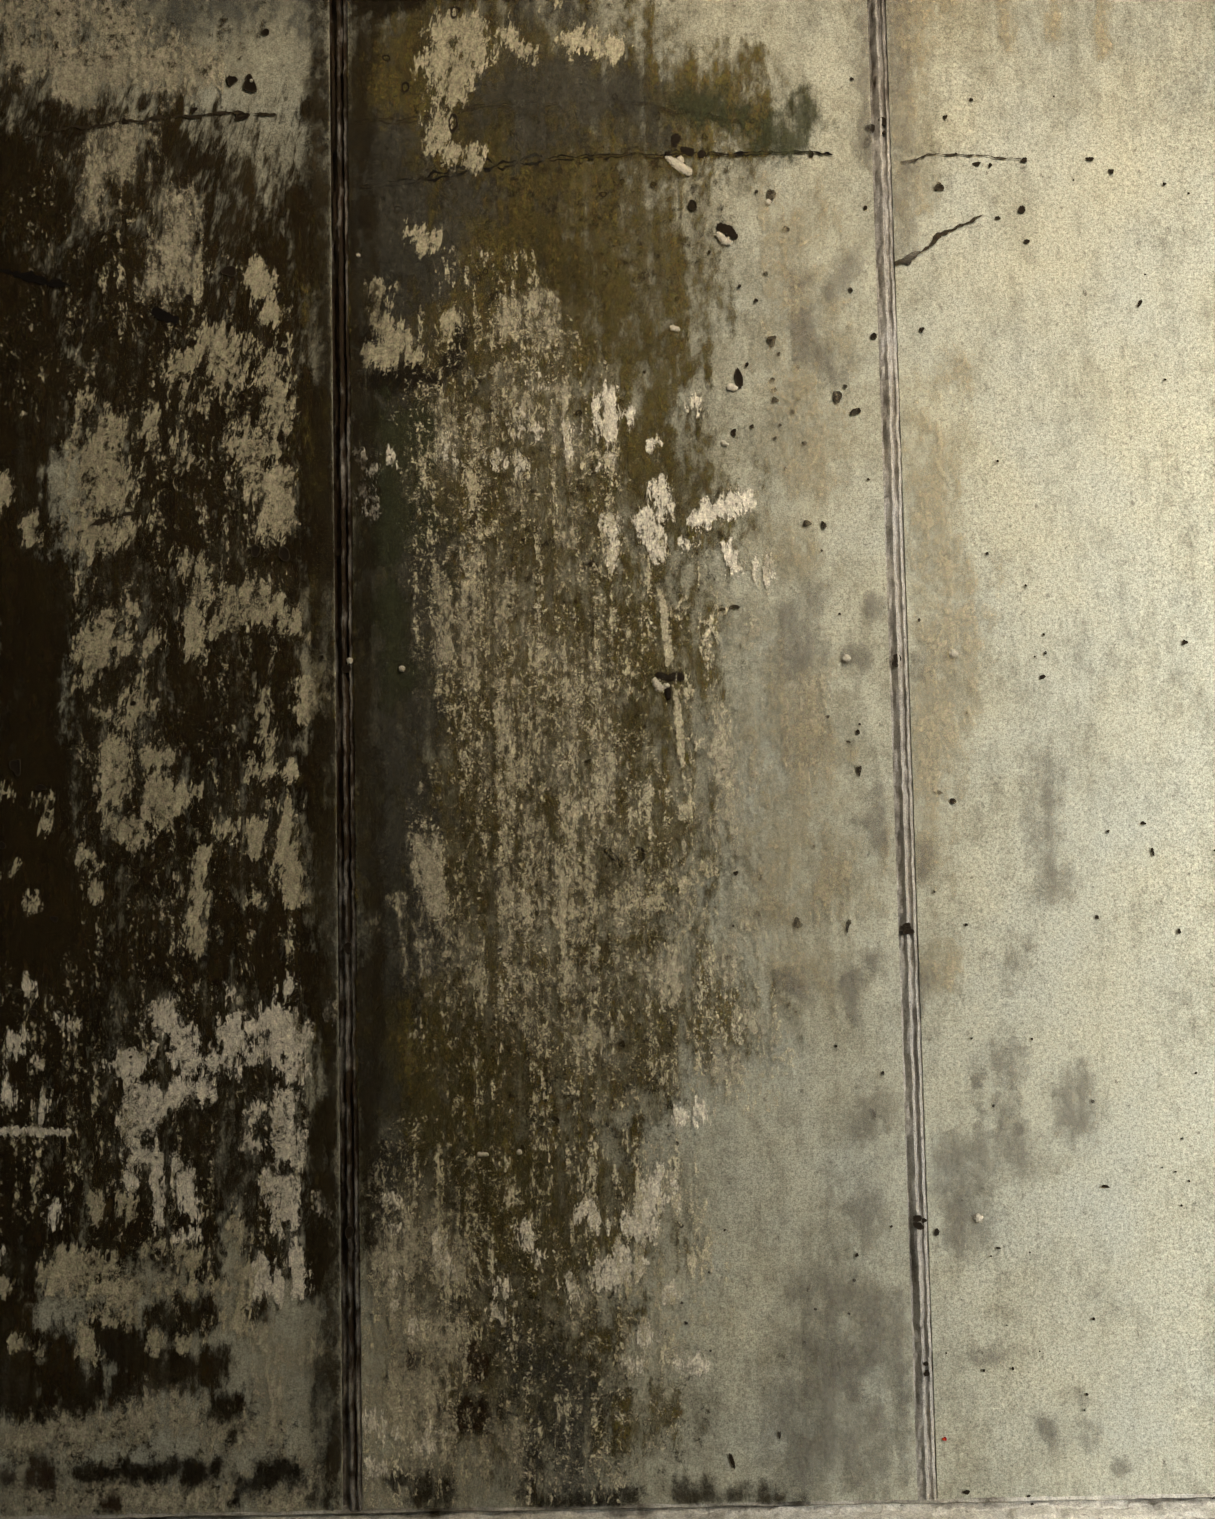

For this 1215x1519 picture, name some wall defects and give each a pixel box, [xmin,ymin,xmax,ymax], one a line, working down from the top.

crack [359,100,834,189]
crack [900,153,1021,163]
crack [0,269,72,288]
crack [894,215,982,265]
leakage [904,412,994,877]
leakage [0,0,883,1516]